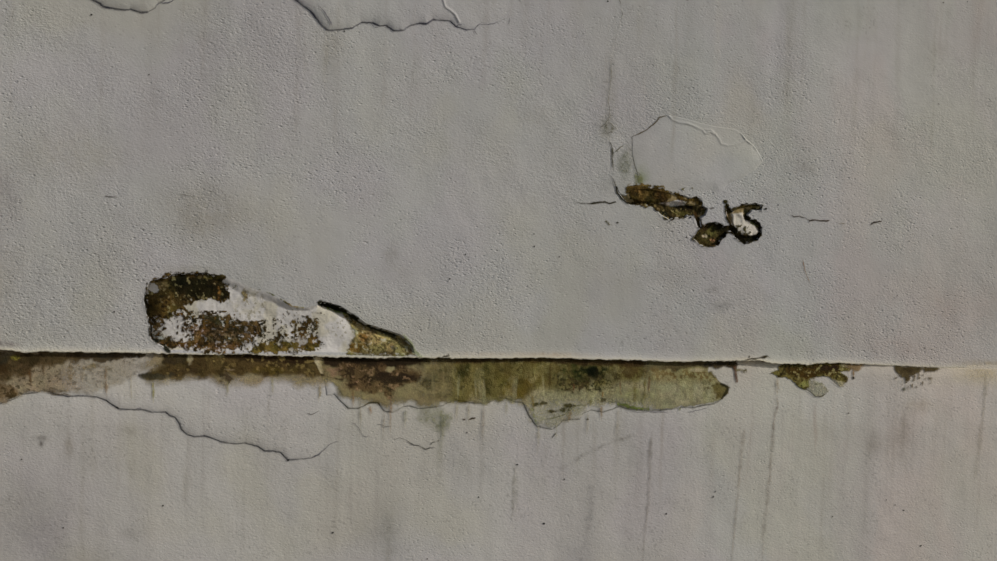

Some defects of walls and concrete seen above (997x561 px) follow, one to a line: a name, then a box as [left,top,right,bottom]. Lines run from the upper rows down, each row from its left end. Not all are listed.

crack [297,1,395,31]
crack [418,18,510,34]
crack [576,70,664,204]
spalling [615,183,764,249]
spalling [142,271,421,357]
damp [0,350,145,403]
peeling [50,376,456,460]
damp [319,357,450,436]
peeling [513,384,719,430]
damp [895,366,939,390]